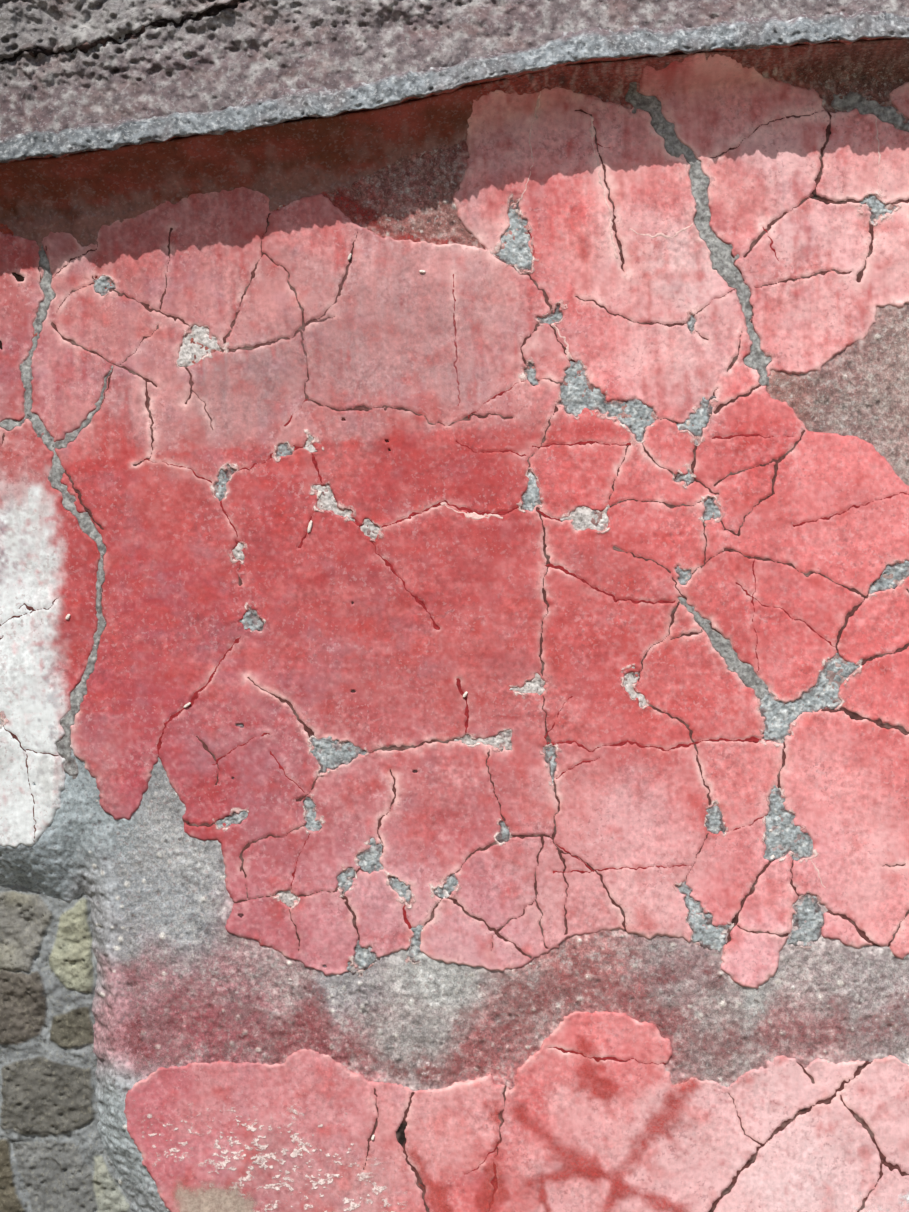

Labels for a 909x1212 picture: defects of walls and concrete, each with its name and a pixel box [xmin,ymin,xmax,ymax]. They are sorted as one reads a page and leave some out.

crack [0,0,247,62]
peeling [771,311,909,481]
crack [0,82,909,958]
spalling [540,744,561,785]
peeling [110,772,909,1083]
crack [547,1047,666,1065]
peeling [142,1114,197,1161]
peeling [204,1107,399,1212]
crack [363,1088,430,1212]
crack [467,1085,507,1211]
crack [709,1061,909,1212]